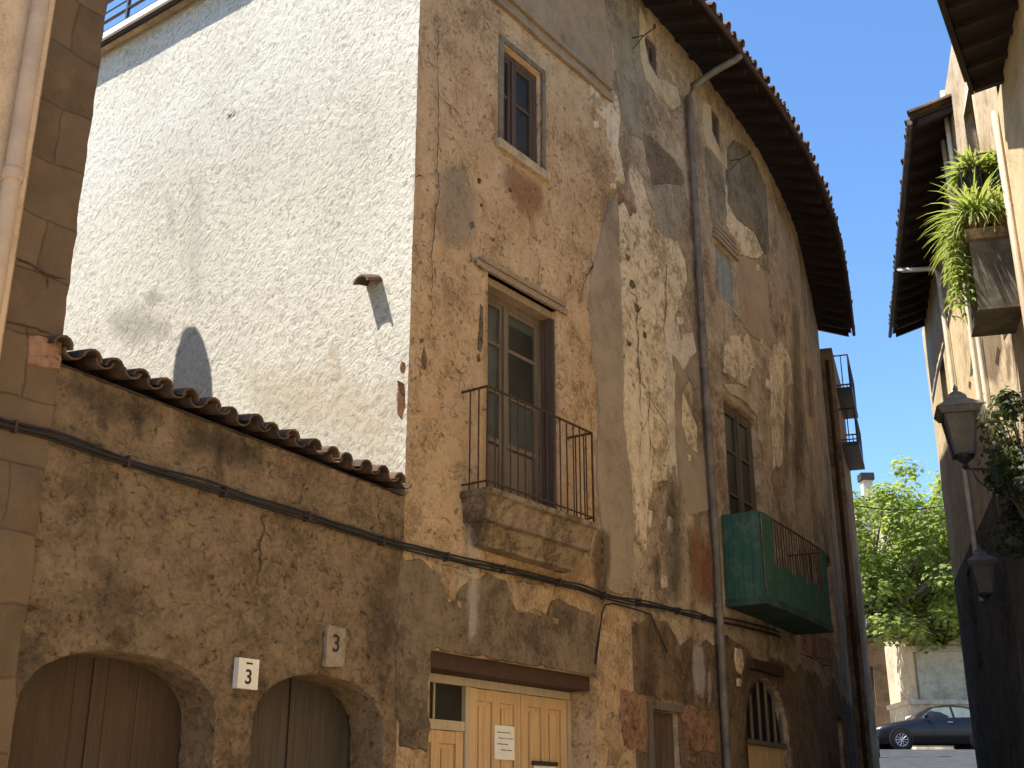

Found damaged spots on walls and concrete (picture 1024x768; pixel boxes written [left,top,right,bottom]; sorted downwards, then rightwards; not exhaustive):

crack [416,7,460,340]
flaking render [589,81,698,553]
crack [252,515,272,576]
flaking render [434,563,473,608]
flaking render [507,578,559,624]
flaking render [734,648,744,687]
flaking render [600,690,715,767]